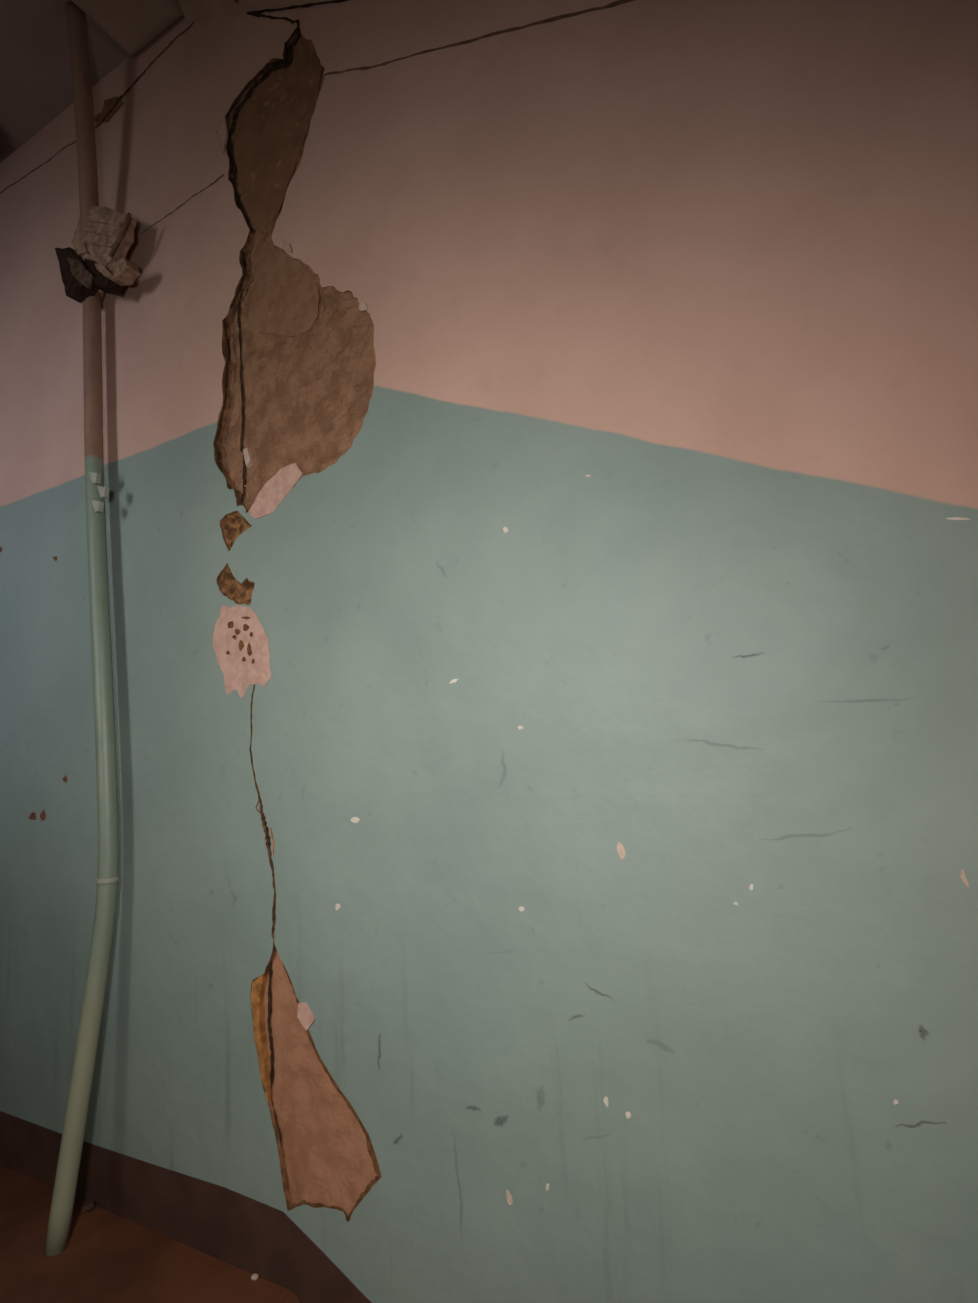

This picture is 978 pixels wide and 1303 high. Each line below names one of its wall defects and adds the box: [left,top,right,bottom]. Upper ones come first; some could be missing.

crack [246,0,347,36]
crack [324,0,635,76]
peeling [72,240,140,286]
spalling [214,29,376,550]
peeling [213,566,271,697]
crack [255,799,275,868]
spalling [251,952,382,1223]